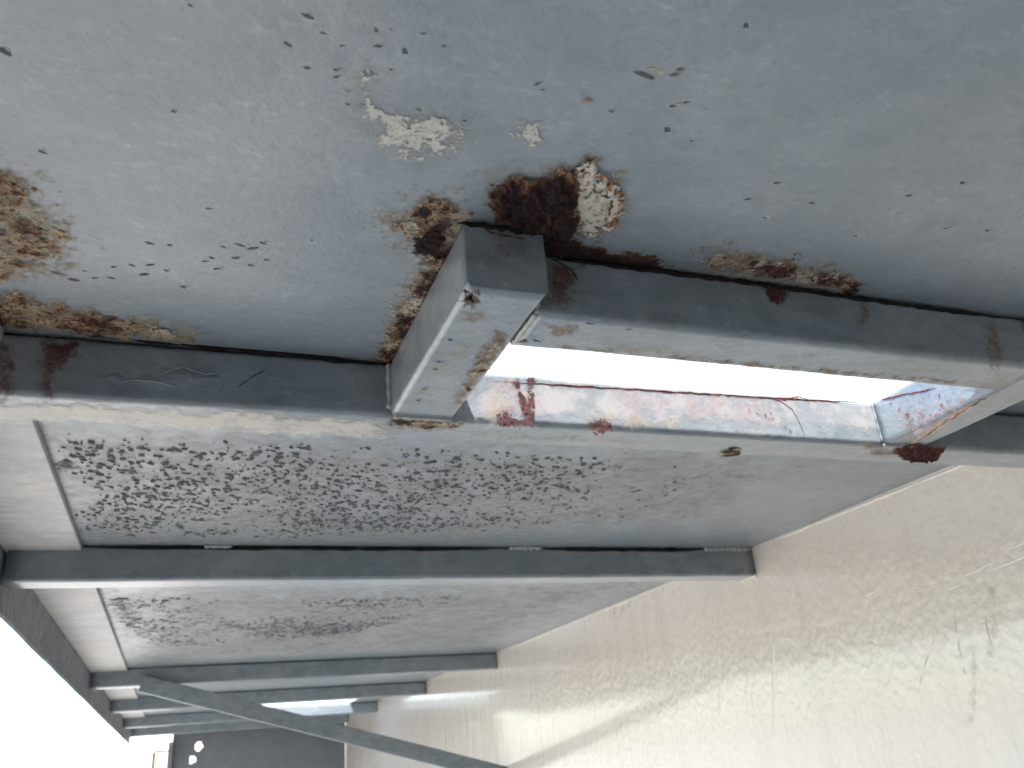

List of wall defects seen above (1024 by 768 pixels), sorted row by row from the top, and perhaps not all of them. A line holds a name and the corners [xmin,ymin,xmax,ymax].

peeling [345,68,468,162]
peeling [509,121,543,150]
rust [485,159,673,302]
peeling [571,155,629,243]
rust [0,170,198,403]
rust [374,193,473,365]
rust [690,244,865,308]
rust [588,418,614,436]
rust [495,377,949,429]
rust [717,447,741,457]
rust [865,397,987,464]